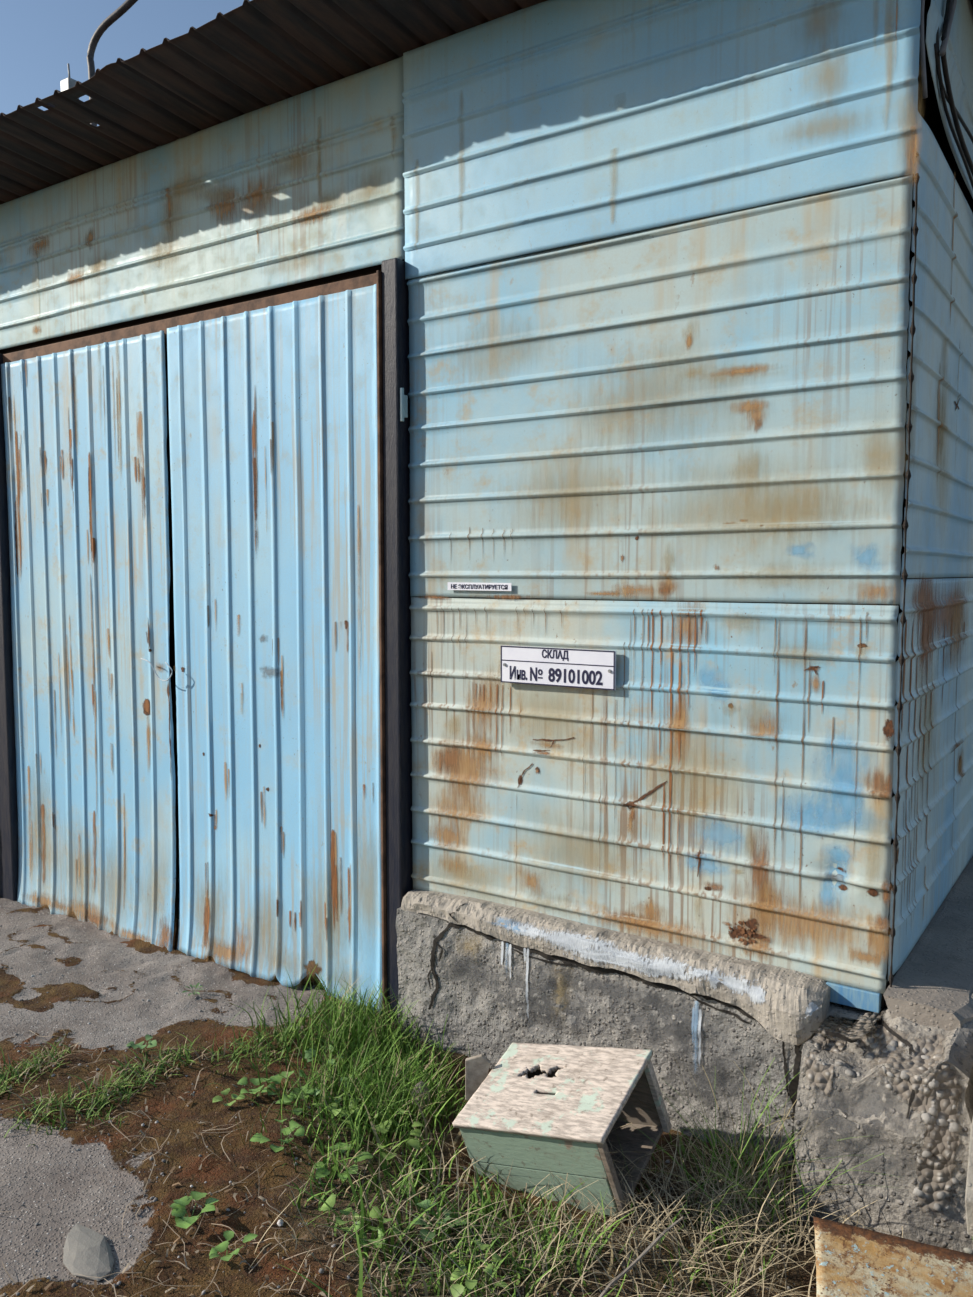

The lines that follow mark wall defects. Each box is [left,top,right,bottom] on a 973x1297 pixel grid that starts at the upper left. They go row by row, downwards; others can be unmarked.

rust [8,397,21,575]
rust [252,394,274,550]
rust [28,372,171,947]
rust [324,830,351,941]
water stain [602,912,691,943]
rust [593,574,707,884]
crack [427,903,915,1159]
rust [725,619,784,955]
water stain [750,895,845,941]
rust [801,629,834,777]
spalling [805,1004,963,1213]
rust [852,580,967,962]